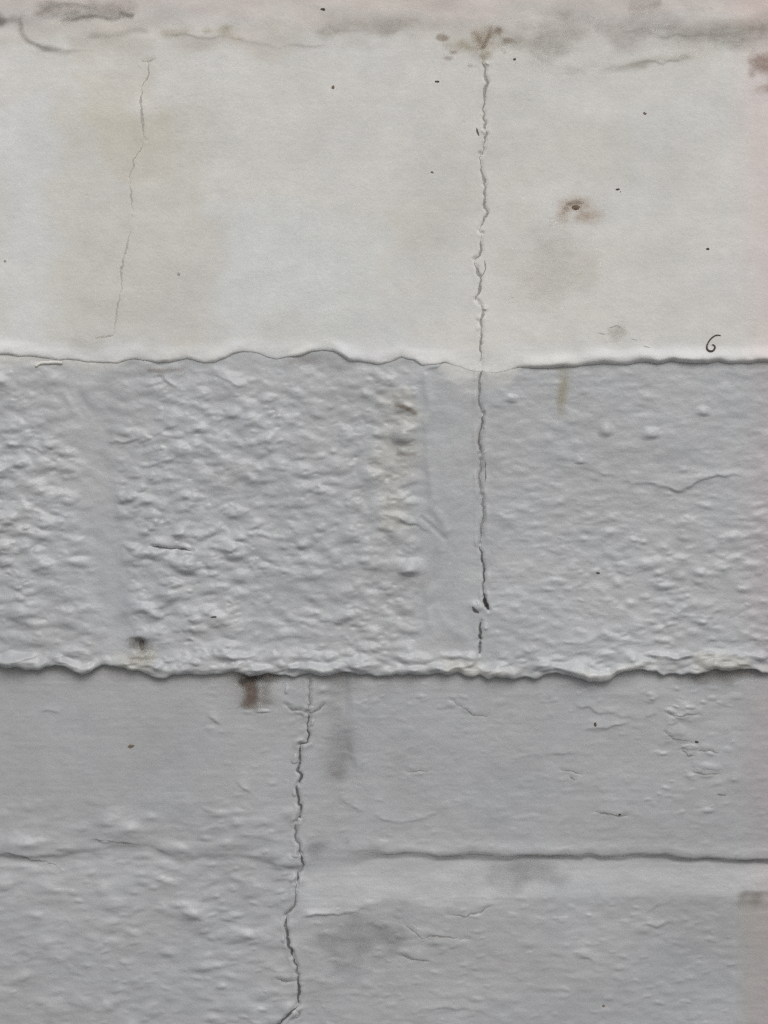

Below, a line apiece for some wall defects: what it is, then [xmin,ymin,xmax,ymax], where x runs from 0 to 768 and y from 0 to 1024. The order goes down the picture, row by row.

crack [472,61,490,653]
crack [279,679,322,1024]